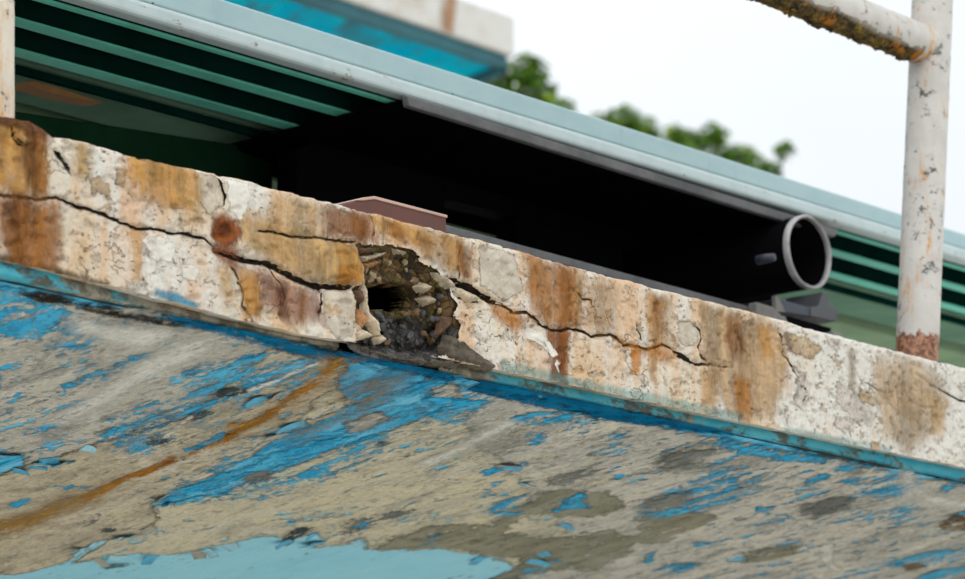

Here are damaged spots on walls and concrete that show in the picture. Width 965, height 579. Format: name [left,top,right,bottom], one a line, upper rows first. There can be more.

rust [0,117,61,271]
crack [10,127,71,174]
peeling [142,235,200,281]
rust [0,356,345,534]
crack [0,193,352,320]
crack [218,178,227,205]
crack [258,216,375,243]
rust [211,198,471,319]
peeling [0,242,965,579]
rust [493,254,581,383]
crack [449,254,727,368]
rust [700,304,787,422]